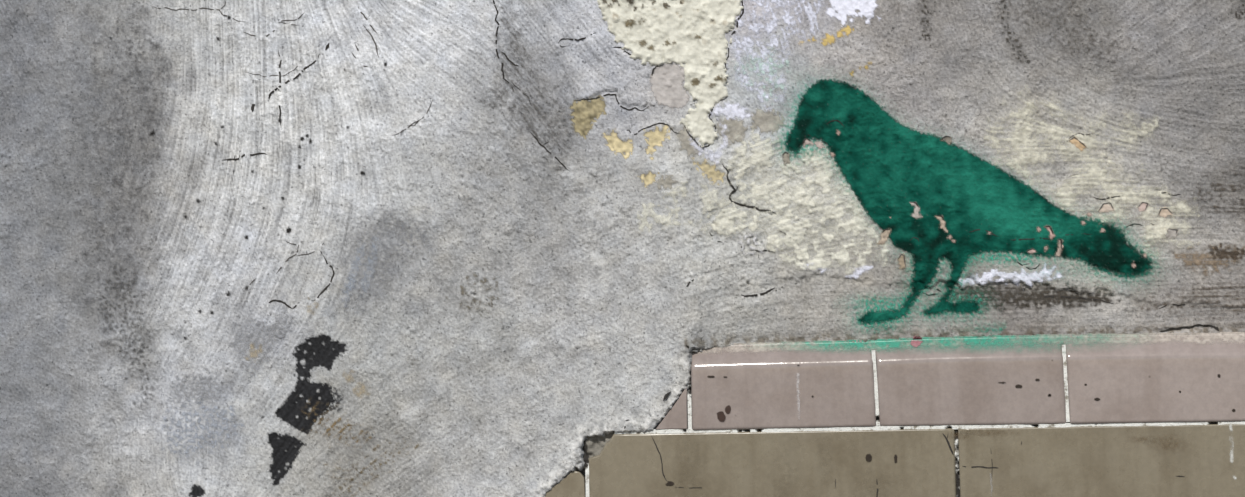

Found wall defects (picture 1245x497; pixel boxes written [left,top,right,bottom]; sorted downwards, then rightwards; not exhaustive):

crack [150,1,304,37]
crack [493,0,569,171]
crack [559,33,658,76]
crack [575,0,791,252]
peeling [597,0,906,274]
crack [247,242,335,309]
crack [742,283,796,297]
spalling [582,431,615,468]